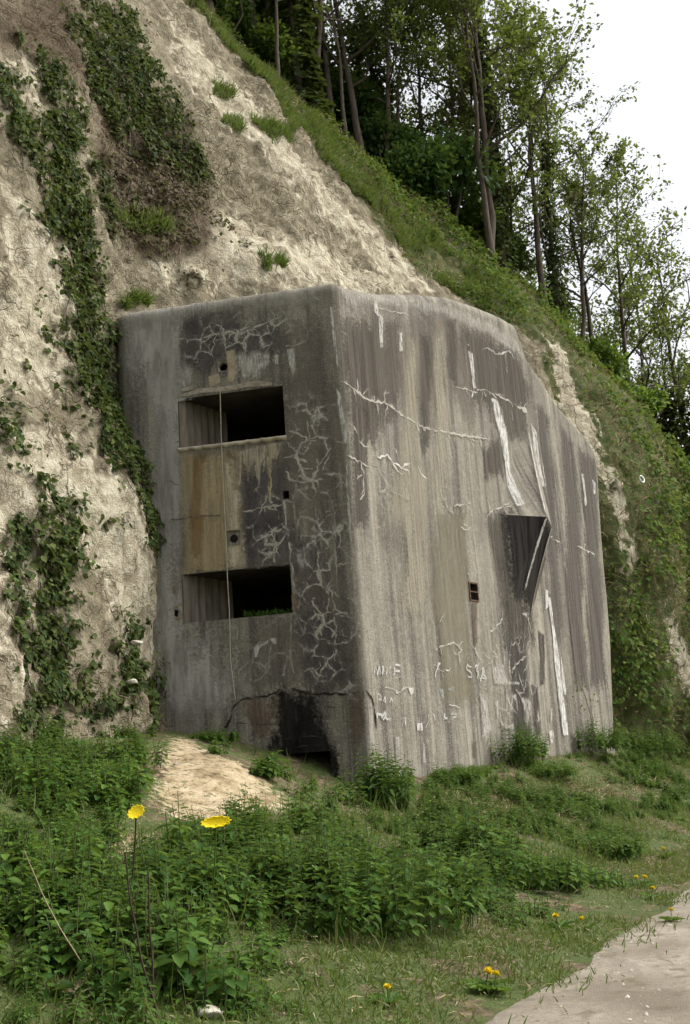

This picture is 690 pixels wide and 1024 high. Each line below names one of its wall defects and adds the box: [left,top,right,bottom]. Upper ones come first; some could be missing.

crack [178,311,311,358]
crack [333,381,490,446]
crack [458,386,527,413]
rust [172,449,243,593]
crack [172,403,511,749]
damp [117,287,608,778]